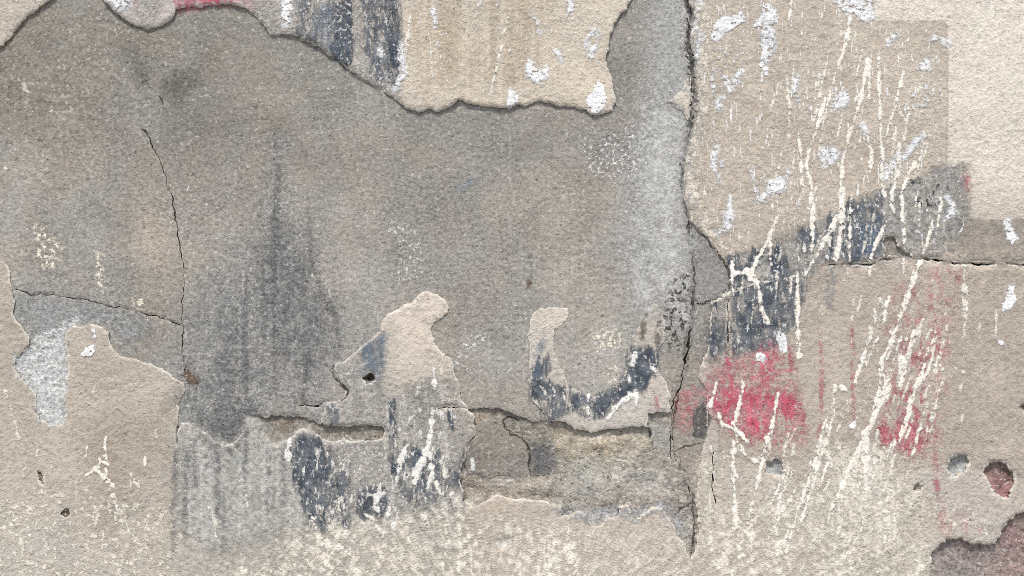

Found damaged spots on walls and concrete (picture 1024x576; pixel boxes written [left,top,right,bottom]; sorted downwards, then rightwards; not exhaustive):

crack [141,128,184,265]
peeling [0,0,730,558]
crack [648,0,731,554]
crack [921,257,1024,266]
crack [17,289,187,374]
crack [302,365,349,407]
crack [502,416,531,471]
spalling [983,461,1014,498]
spalling [930,512,1024,576]